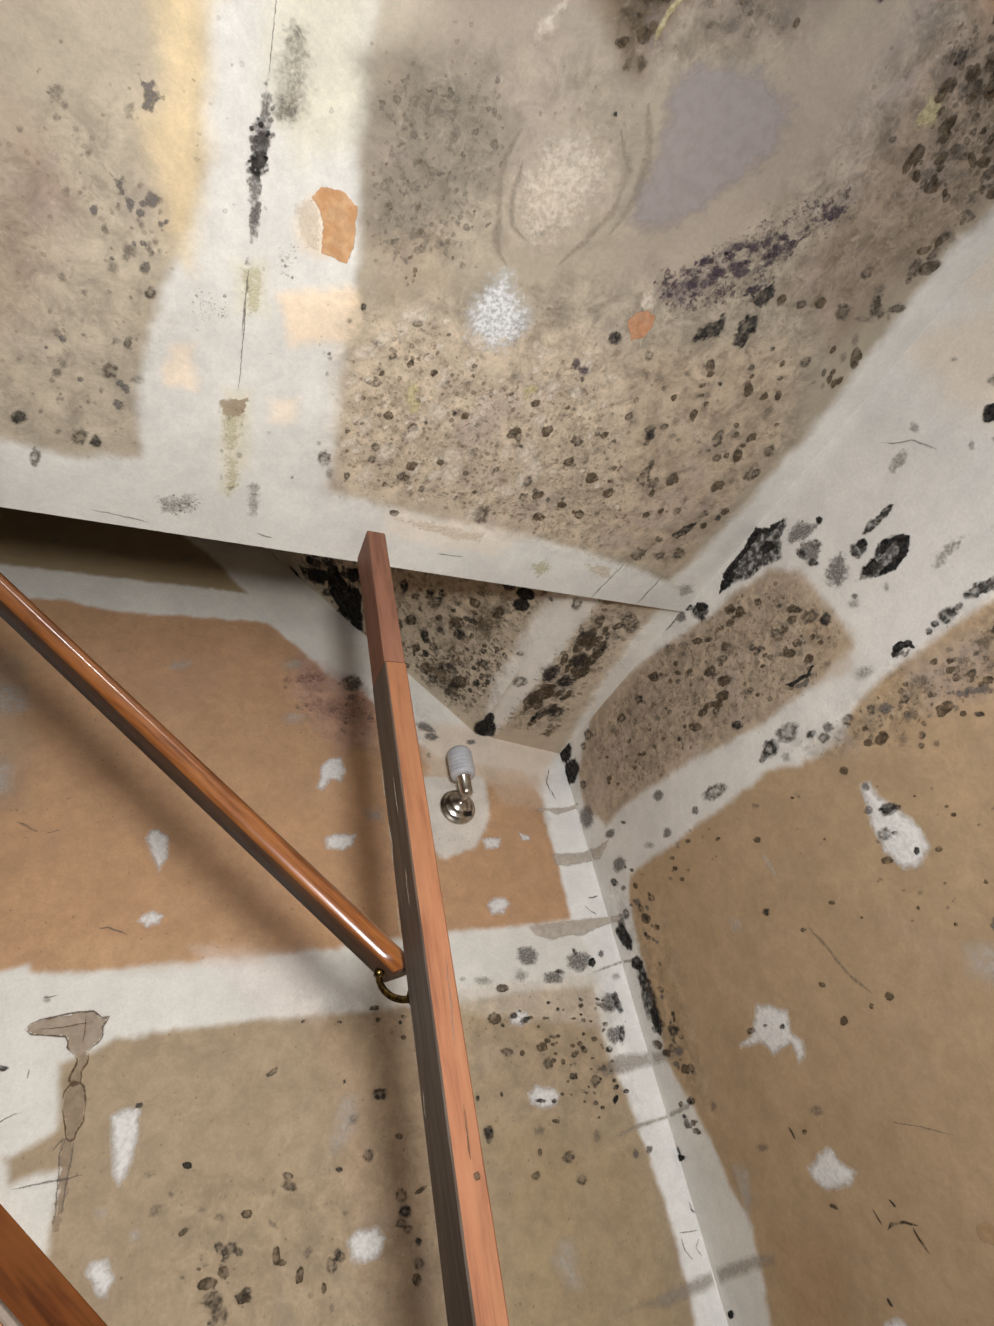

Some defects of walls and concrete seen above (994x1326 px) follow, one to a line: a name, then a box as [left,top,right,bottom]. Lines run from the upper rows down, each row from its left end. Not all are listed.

leakage [141,80,159,111]
peeling [298,187,358,263]
leakage [653,187,851,349]
leakage [319,273,729,560]
leakage [983,403,994,422]
leakage [290,555,363,631]
leakage [395,573,553,705]
leakage [468,599,637,744]
leakage [759,626,994,763]
leakage [926,577,994,635]
crack [19,1175,81,1189]
leakage [197,1243,251,1325]